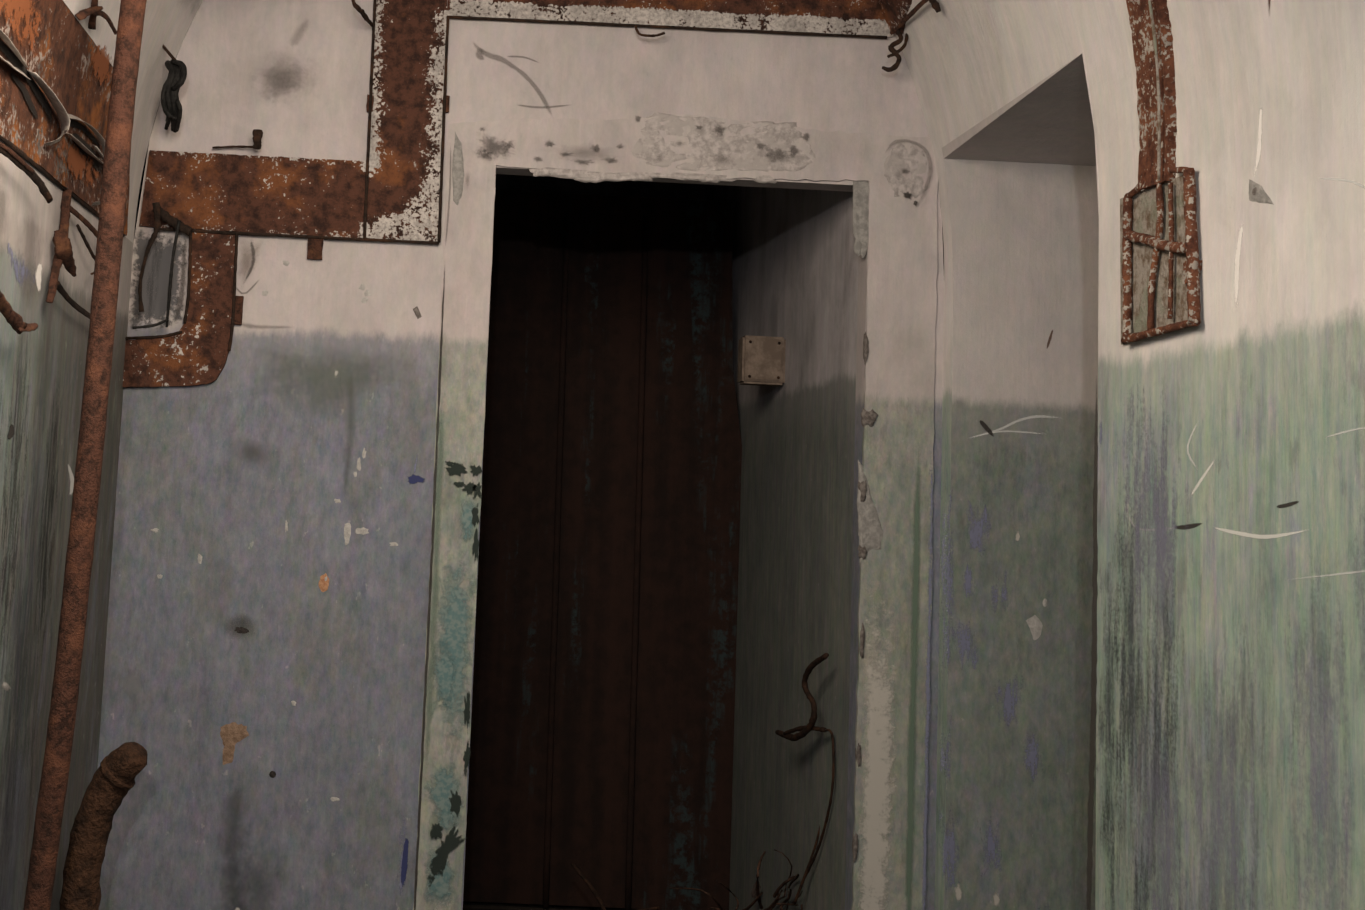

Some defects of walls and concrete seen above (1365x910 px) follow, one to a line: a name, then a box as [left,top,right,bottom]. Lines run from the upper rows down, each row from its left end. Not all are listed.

rust [0,0,42,58]
rust [89,45,112,86]
rust [57,138,99,188]
flaking render [529,112,815,184]
peeling [428,431,474,733]
peeling [427,768,458,829]
peeling [426,846,454,905]